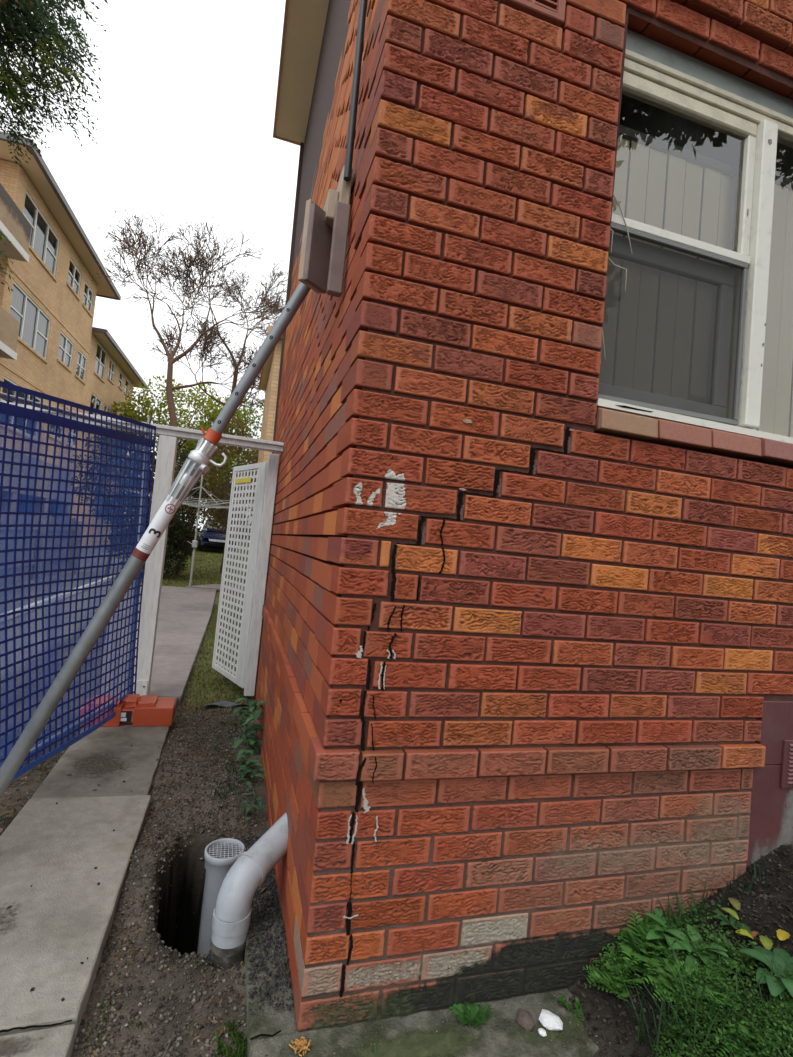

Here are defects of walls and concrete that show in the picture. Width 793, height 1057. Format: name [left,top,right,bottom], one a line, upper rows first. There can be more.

crack [339,427,572,997]
leakage [306,918,624,1031]